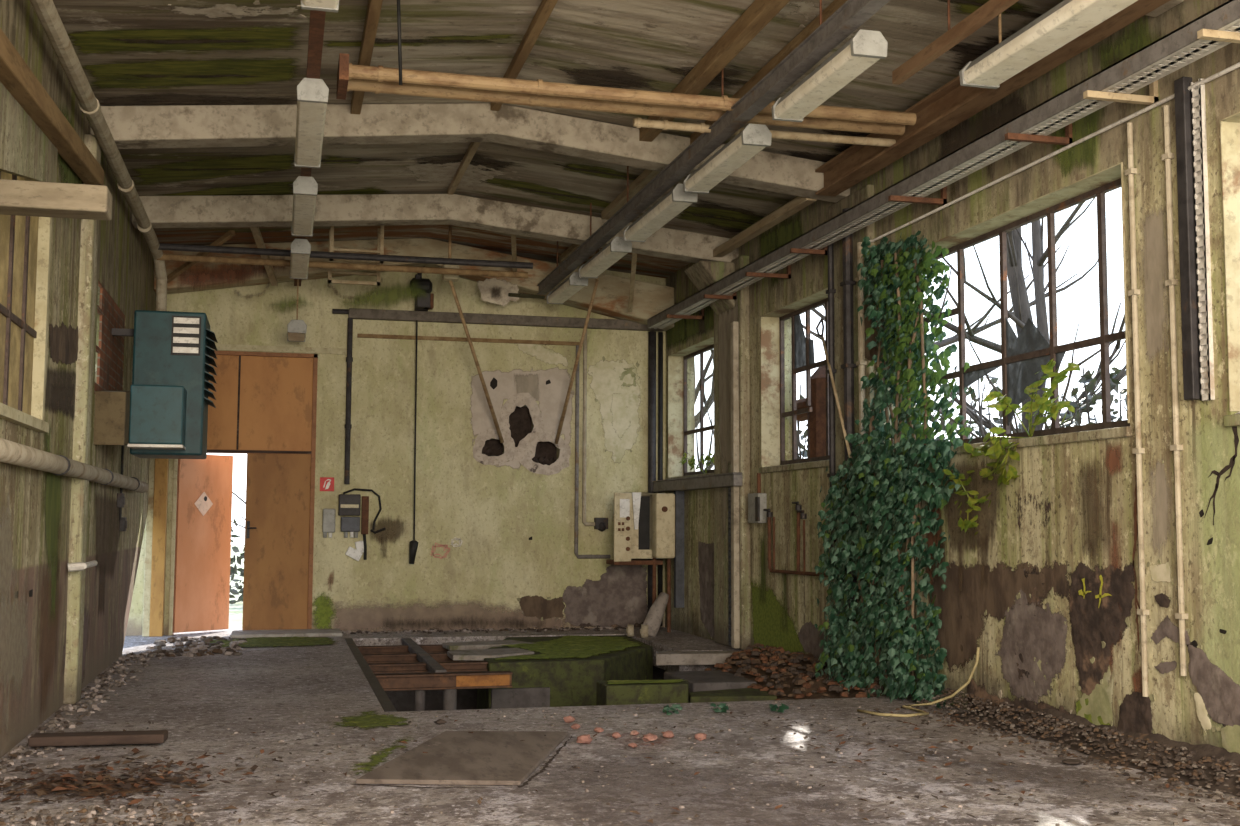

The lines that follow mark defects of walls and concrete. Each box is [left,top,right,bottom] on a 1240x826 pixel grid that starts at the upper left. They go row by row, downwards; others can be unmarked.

peeling [470,337,575,475]
peeling [588,356,641,463]
crack [1204,426,1239,525]
leakage [96,493,120,612]
spalling [517,565,648,628]
spalling [930,460,1240,754]